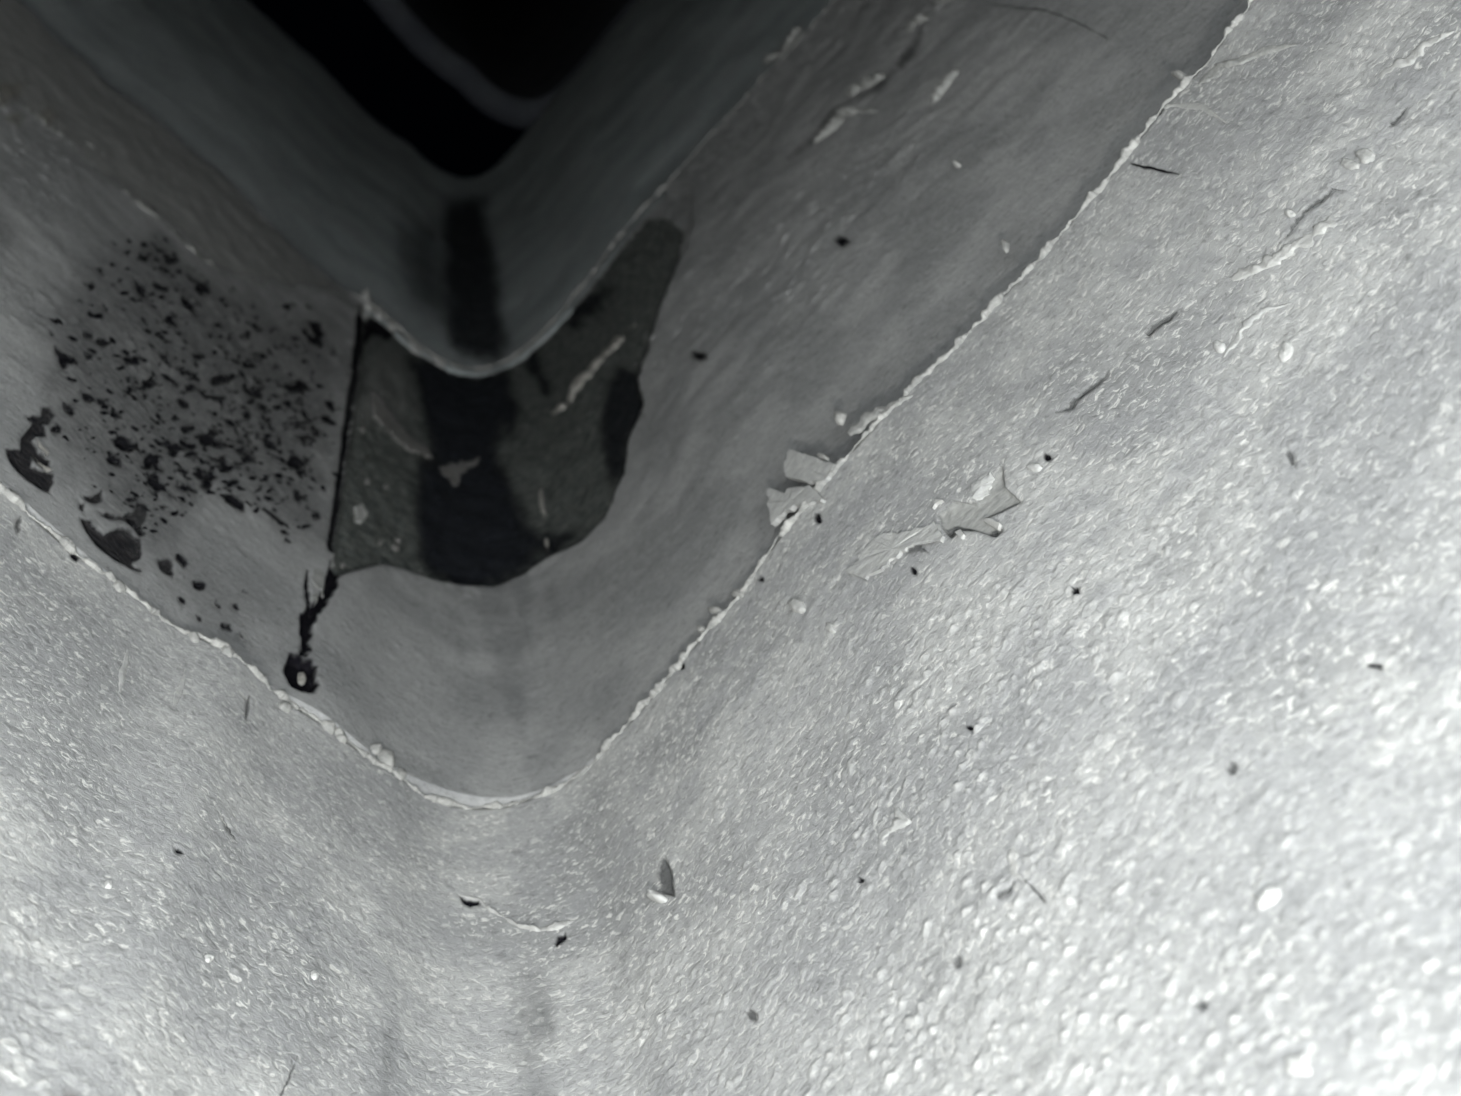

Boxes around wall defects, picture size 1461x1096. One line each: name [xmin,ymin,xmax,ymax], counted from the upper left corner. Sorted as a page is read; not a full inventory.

spalling [7,219,683,604]